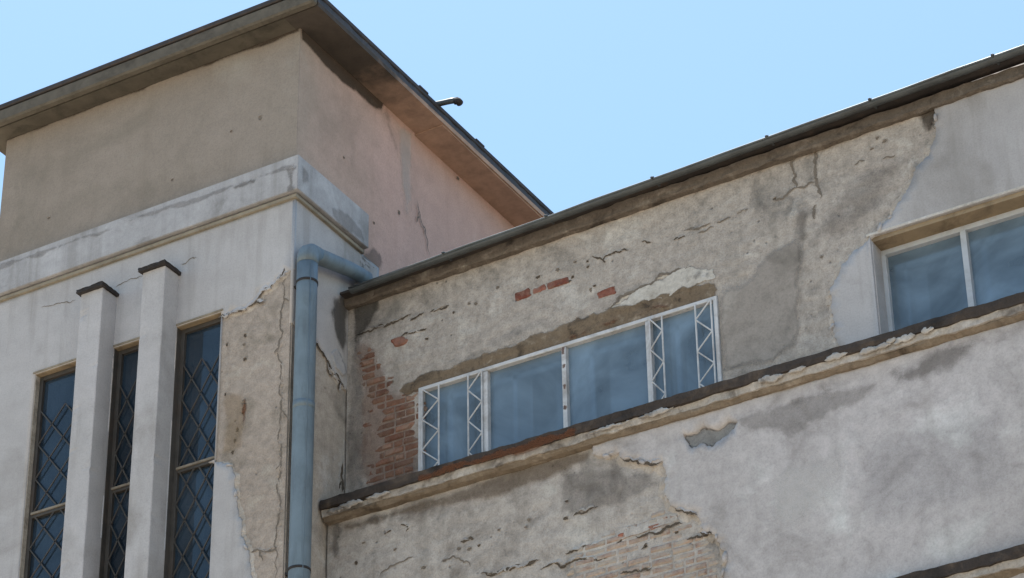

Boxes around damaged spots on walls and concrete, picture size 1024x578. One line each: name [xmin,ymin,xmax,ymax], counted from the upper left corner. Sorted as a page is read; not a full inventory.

crack [218,268,289,576]
spalling [216,268,295,578]
crack [316,341,344,390]
spalling [311,113,937,578]
crack [592,208,747,262]
crack [775,151,822,219]